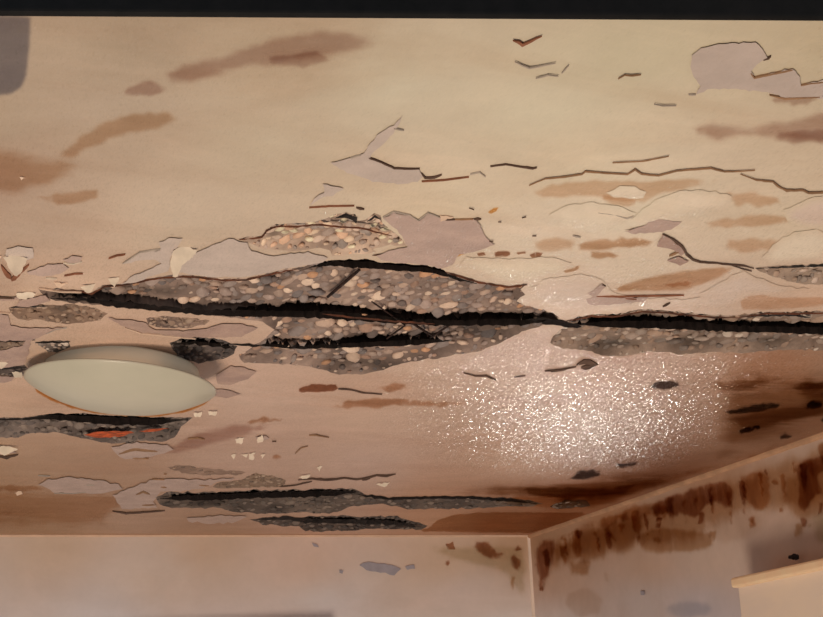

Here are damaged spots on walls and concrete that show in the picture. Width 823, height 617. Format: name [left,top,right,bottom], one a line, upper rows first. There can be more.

peeling [688,42,823,100]
peeling [331,117,486,184]
crack [529,155,823,194]
crack [662,234,754,272]
spalling [0,184,823,398]
spalling [0,411,217,460]
rust [85,428,166,438]
mould [728,404,779,414]
spalling [38,465,590,532]
leakage [572,470,599,479]